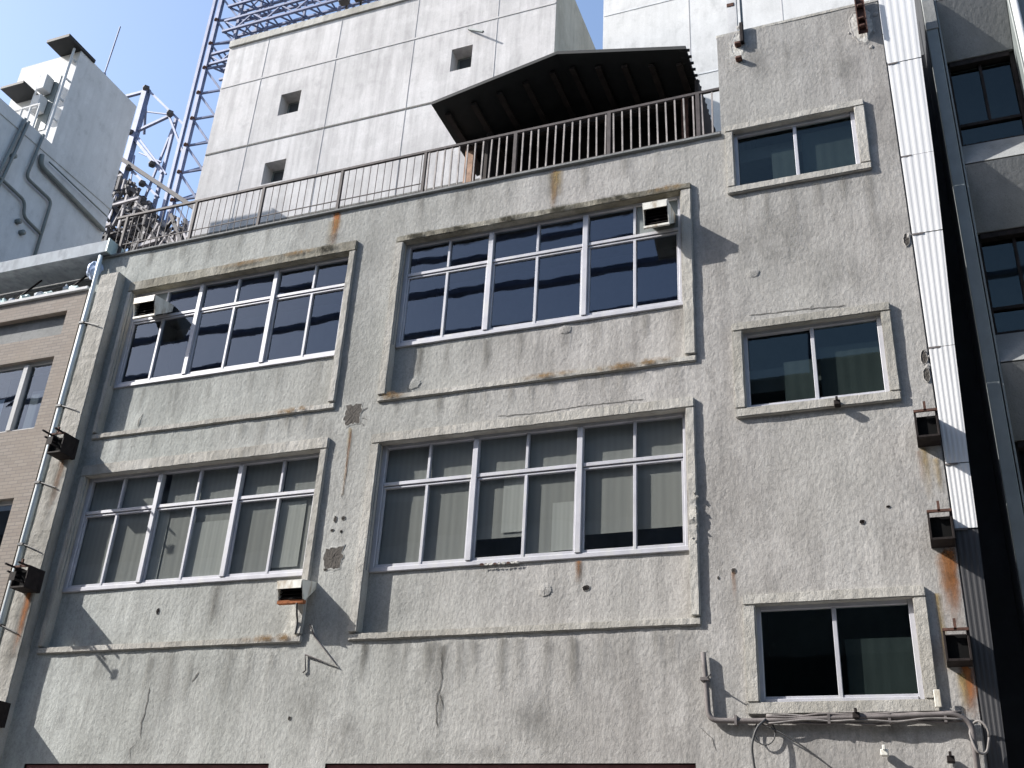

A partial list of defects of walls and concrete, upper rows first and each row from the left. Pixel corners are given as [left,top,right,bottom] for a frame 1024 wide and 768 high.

spalling [342,402,364,428]
spalling [322,516,346,572]
rust [936,549,957,608]
crack [435,652,443,727]
rust [959,667,974,700]
crack [129,688,150,754]